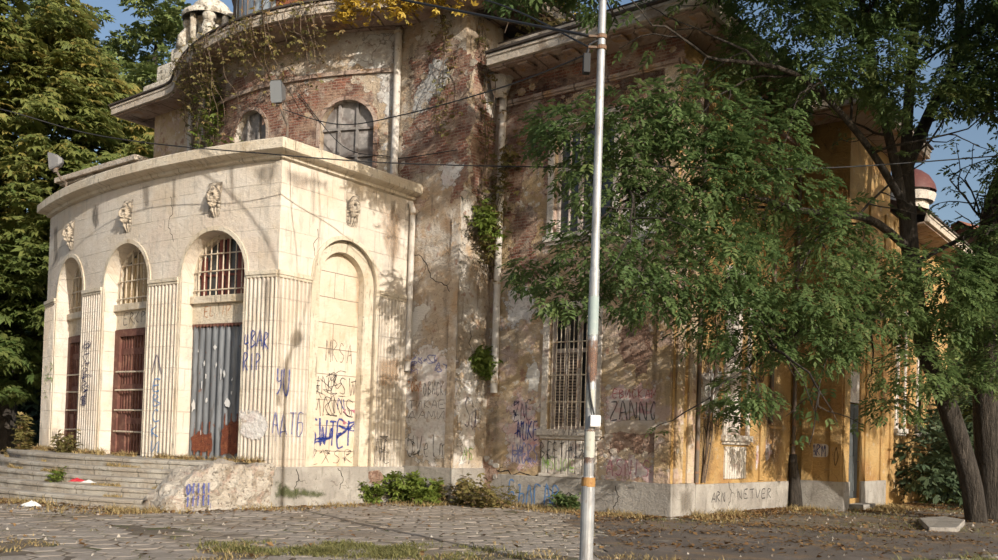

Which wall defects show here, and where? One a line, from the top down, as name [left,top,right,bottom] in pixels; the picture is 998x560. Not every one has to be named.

flaking render [203,28,687,335]
crack [415,254,450,292]
corrosion [191,413,239,457]
peeling [404,301,482,467]
peeling [483,359,542,496]
flaking render [601,320,657,483]